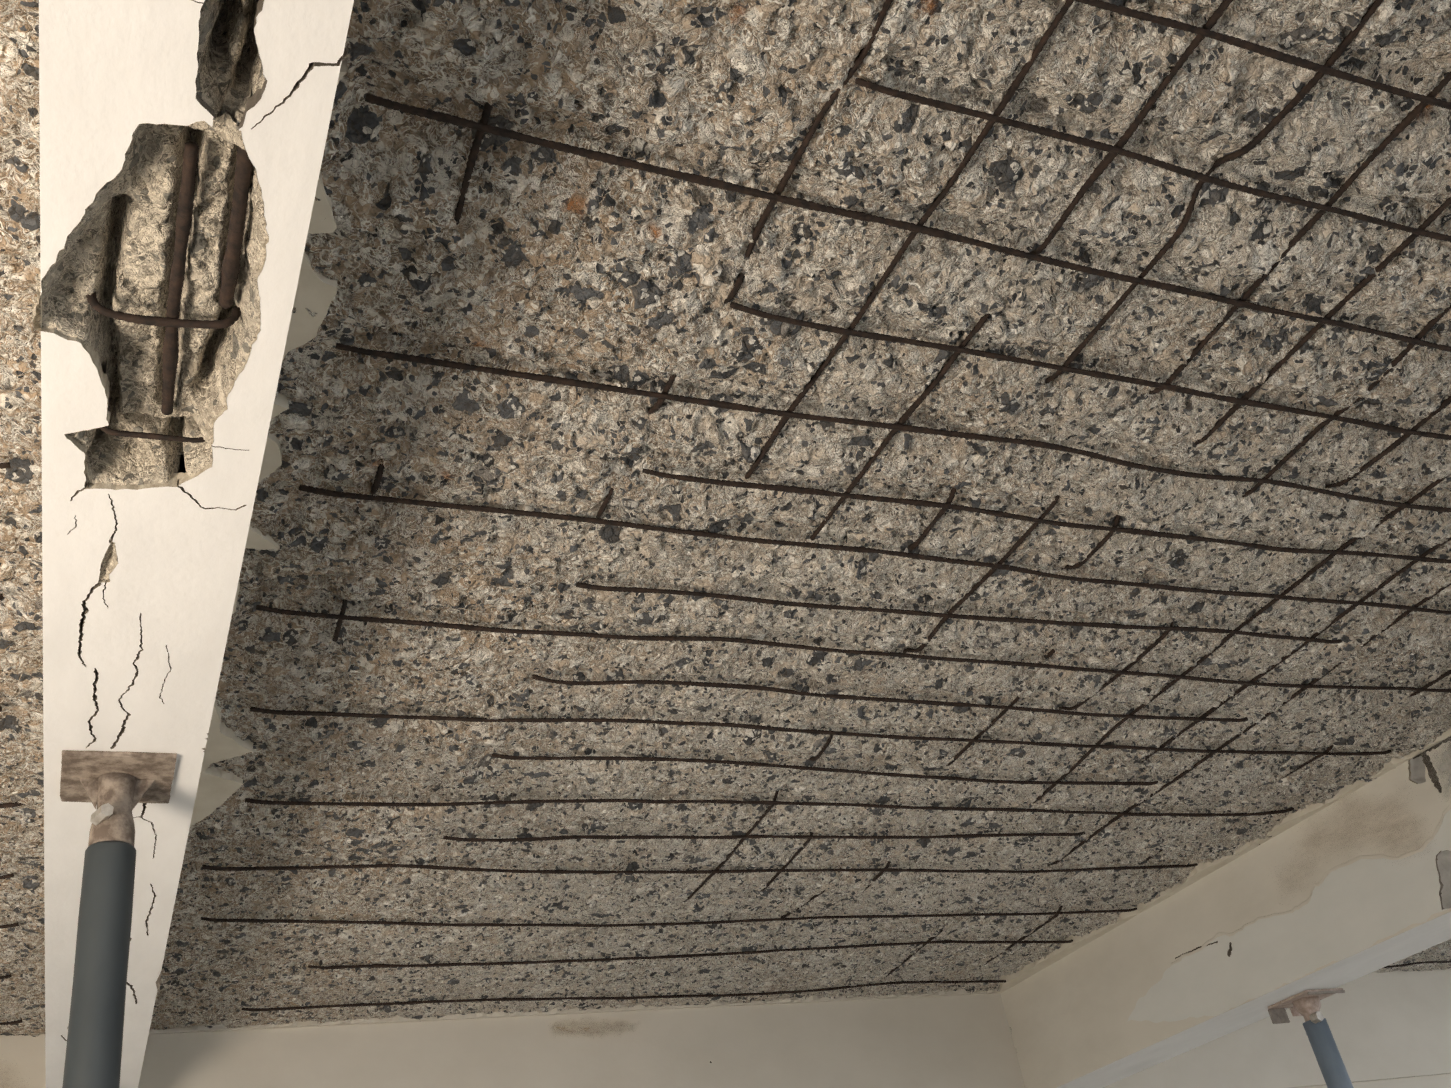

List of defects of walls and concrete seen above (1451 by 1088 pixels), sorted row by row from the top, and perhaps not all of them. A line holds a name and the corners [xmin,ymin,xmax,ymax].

crack [251,44,349,129]
spalling [365,88,1451,431]
spalling [855,0,1451,340]
crack [68,482,118,543]
crack [77,580,171,749]
spalling [0,0,269,1037]
crack [177,480,246,510]
spalling [256,468,1451,693]
spalling [335,343,1451,557]
spalling [730,302,1451,508]
crack [130,803,157,941]
crack [126,982,137,1004]